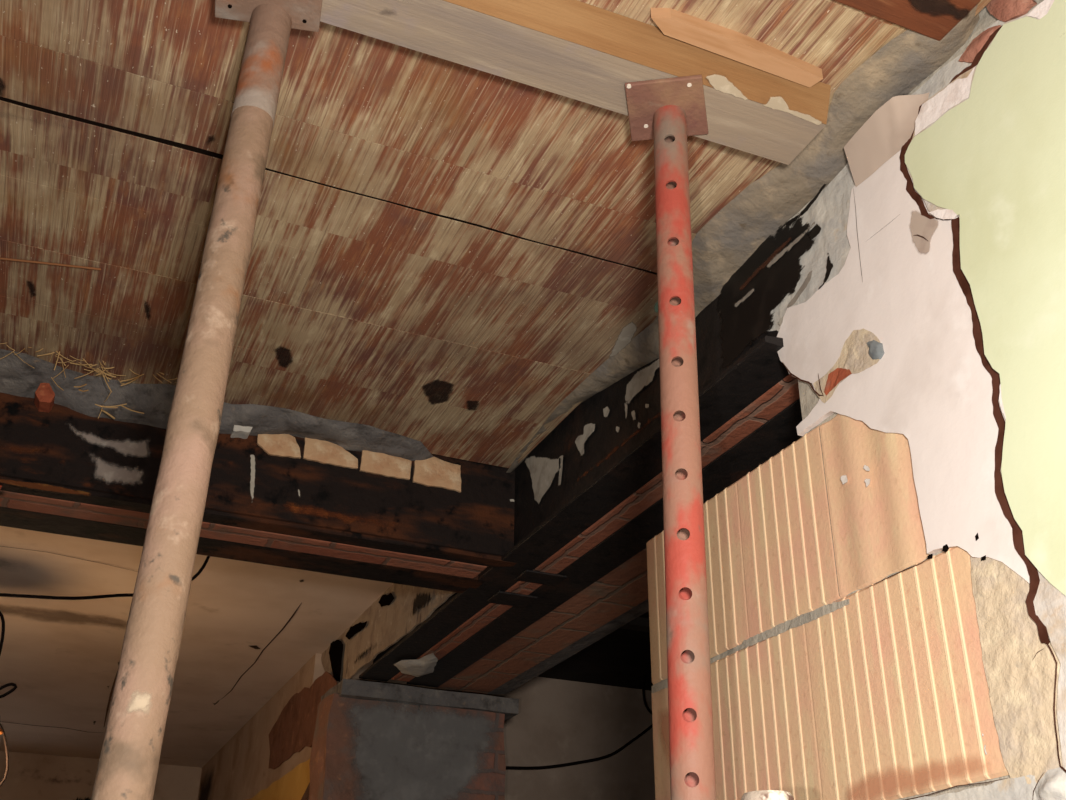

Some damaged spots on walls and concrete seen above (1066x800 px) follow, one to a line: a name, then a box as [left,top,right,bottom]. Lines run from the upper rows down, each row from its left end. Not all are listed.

flaking render [958,0,1037,63]
crack [1026,0,1054,19]
spalling [782,328,884,403]
crack [853,25,1066,772]
crack [213,580,304,705]
peeling [269,583,456,769]
crack [905,778,1007,800]